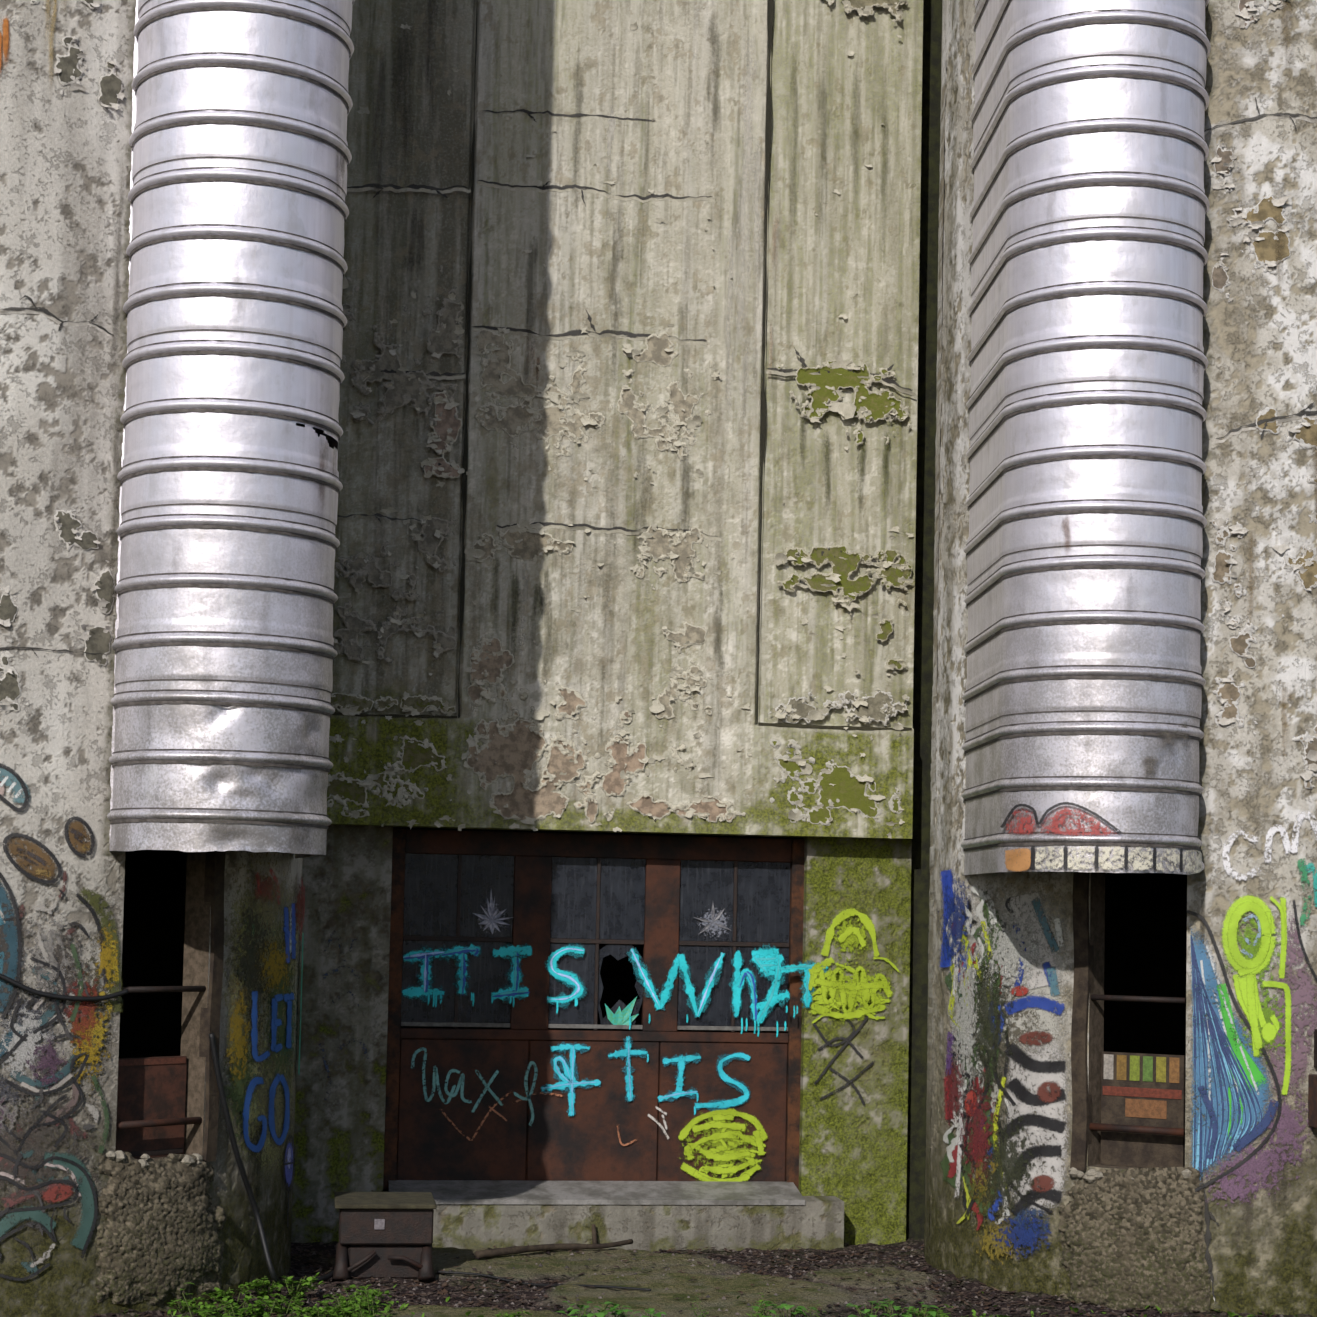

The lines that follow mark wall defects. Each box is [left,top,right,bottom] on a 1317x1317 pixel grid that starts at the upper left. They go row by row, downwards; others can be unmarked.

crack [483,109,655,122]
crack [347,180,715,206]
peeling [1211,194,1291,302]
crack [472,311,707,346]
peeling [341,287,722,488]
peeling [776,344,911,450]
peeling [1255,403,1317,449]
peeling [0,584,29,713]
peeling [327,507,746,832]
spalling [774,526,914,676]
peeling [1272,543,1317,592]
peeling [768,658,910,839]